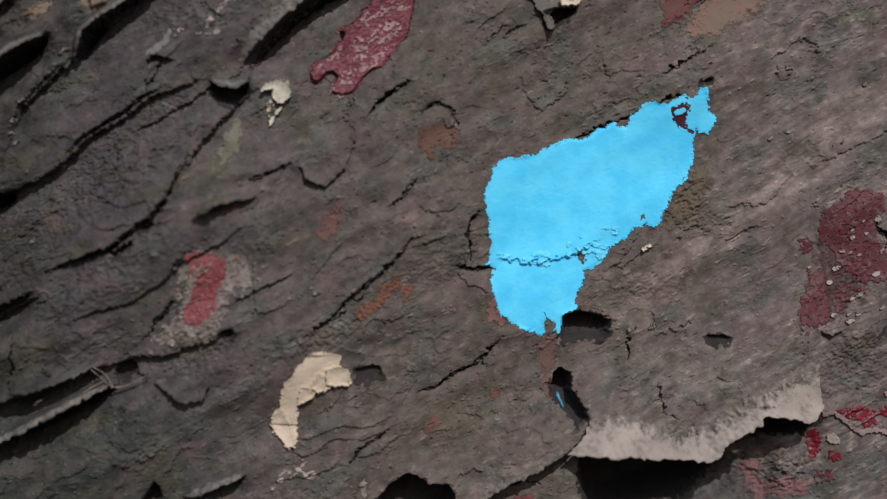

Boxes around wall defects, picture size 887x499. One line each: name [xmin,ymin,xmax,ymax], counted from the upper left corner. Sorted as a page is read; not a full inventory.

peeling [208,0,334,126]
crack [70,62,162,149]
crack [45,155,192,274]
crack [0,292,33,311]
peeling [0,359,140,443]
crack [141,298,175,341]
peeling [269,351,386,450]
crack [420,336,505,391]
spalling [556,307,613,347]
peeling [467,361,825,499]
spalling [374,473,456,499]